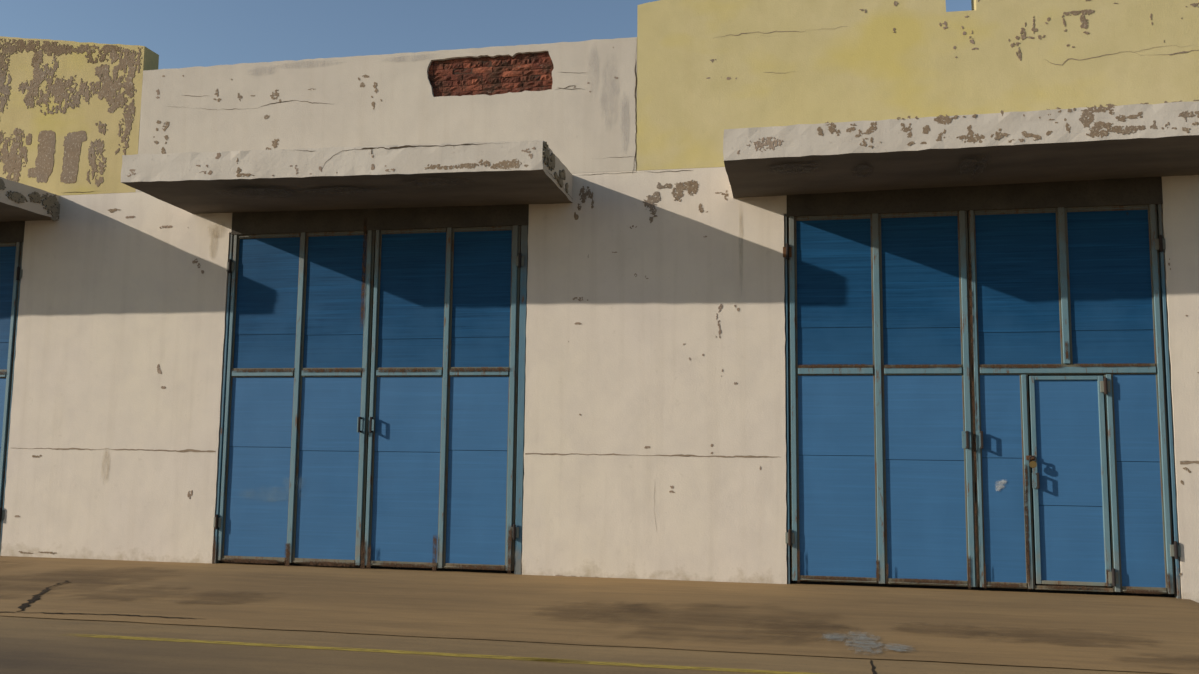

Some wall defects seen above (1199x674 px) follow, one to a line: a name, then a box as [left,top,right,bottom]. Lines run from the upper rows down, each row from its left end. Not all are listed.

peeling [1008,0,1095,61]
flaking render [428,52,554,97]
crack [1048,45,1198,65]
peeling [0,38,142,221]
crack [290,143,503,170]
peeling [817,122,881,148]
peeling [897,100,1199,146]
peeling [424,141,594,220]
peeling [630,180,708,229]